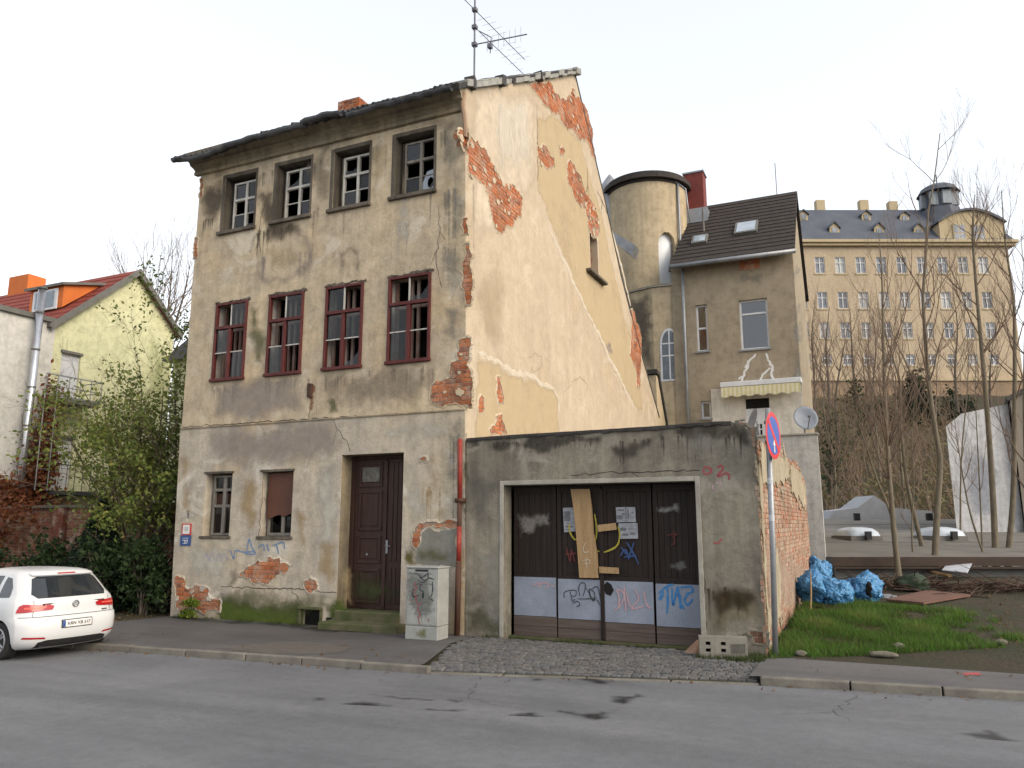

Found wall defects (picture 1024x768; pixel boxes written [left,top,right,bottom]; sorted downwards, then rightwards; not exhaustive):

spalling [529,70,596,160]
leakage [203,188,222,227]
spalling [451,127,523,235]
spalling [536,143,600,239]
spalling [459,216,475,307]
spalling [428,334,507,436]
leakage [493,436,600,452]
leakage [614,435,664,456]
spalling [173,573,223,616]
spalling [238,555,292,587]
leakage [708,587,754,613]
flaking render [725,419,806,654]